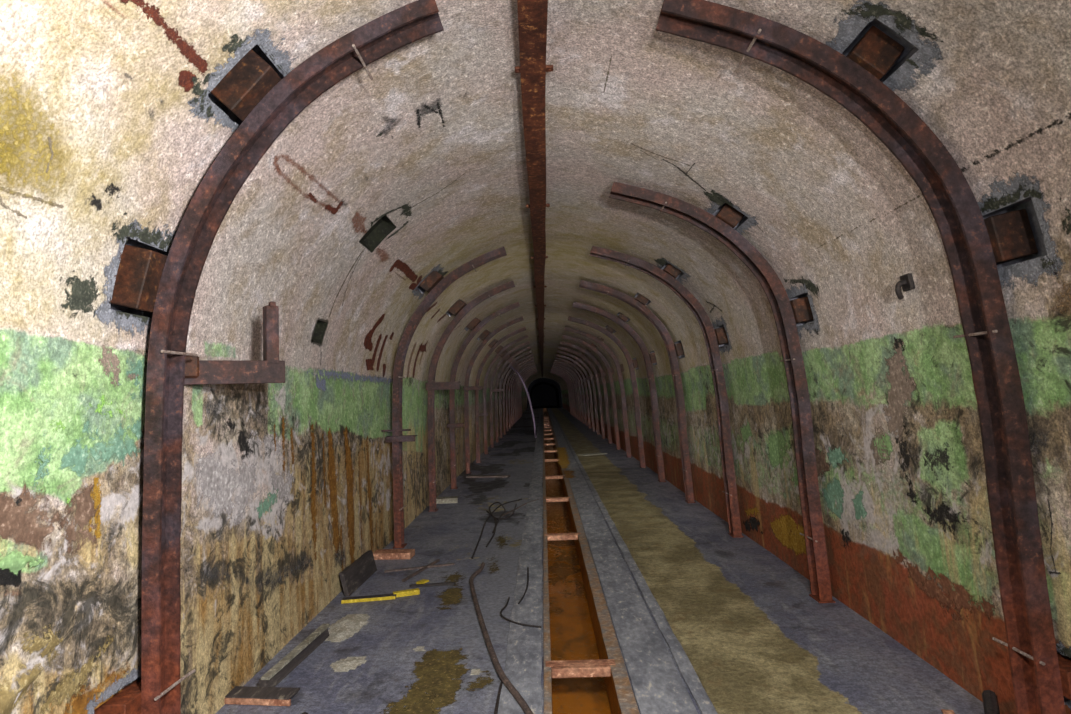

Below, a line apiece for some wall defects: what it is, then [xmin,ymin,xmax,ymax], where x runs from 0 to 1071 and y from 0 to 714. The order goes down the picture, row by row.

corrosion [105,0,208,92]
spalling [187,24,298,132]
spalling [824,0,943,93]
crack [960,112,1071,172]
spalling [60,212,176,338]
crack [819,193,922,248]
spalling [977,172,1071,289]
peeling [95,345,146,400]
peeling [0,395,143,555]
corrosion [274,416,295,472]
corrosion [310,424,373,571]
leakage [895,425,964,539]